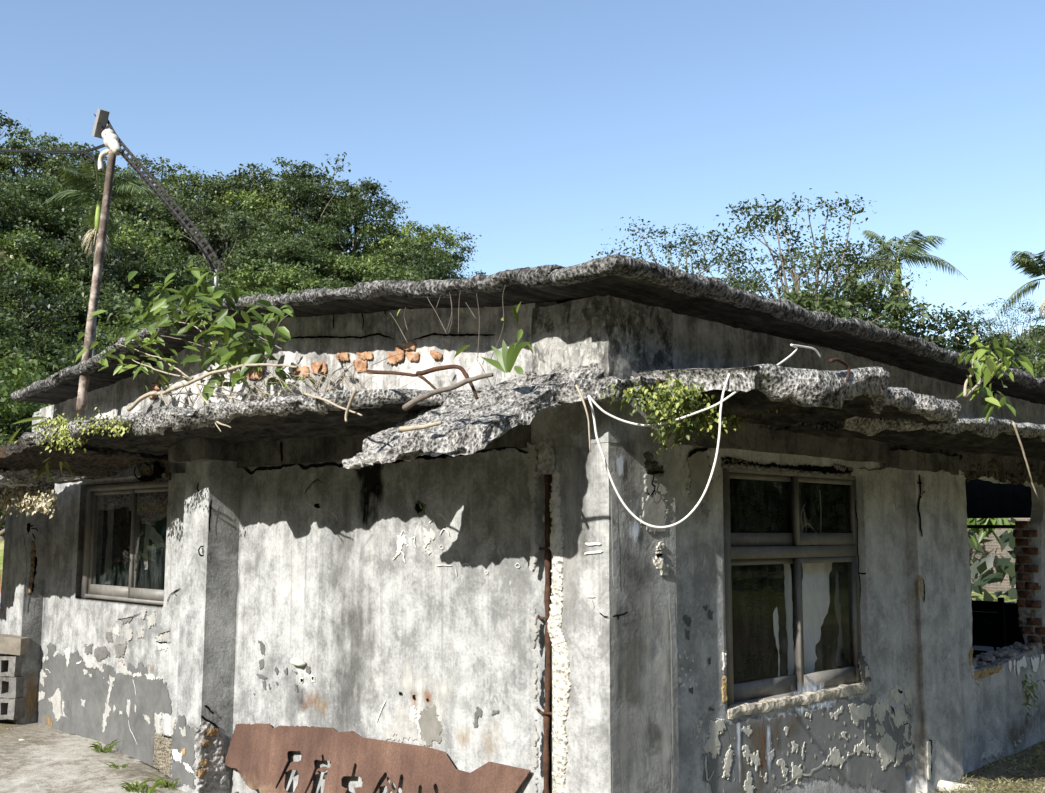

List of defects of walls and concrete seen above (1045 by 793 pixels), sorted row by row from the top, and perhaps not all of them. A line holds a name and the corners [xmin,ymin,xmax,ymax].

damp [356,463,383,526]
crack [917,475,925,537]
spalling [515,440,571,793]
peeling [36,608,230,793]
peeling [473,706,499,728]
peeling [695,652,933,793]